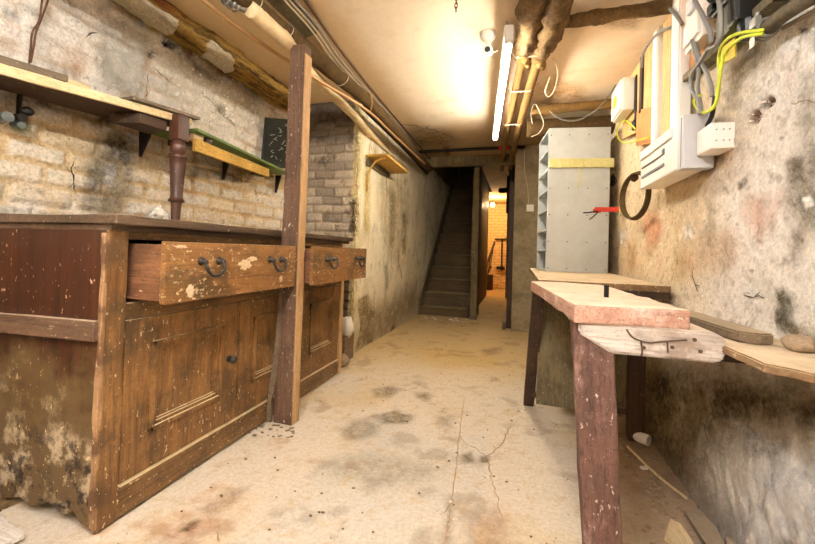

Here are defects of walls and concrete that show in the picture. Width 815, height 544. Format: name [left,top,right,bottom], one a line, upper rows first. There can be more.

water stain [792,160,815,222]
water stain [776,290,814,339]
crack [444,398,511,544]